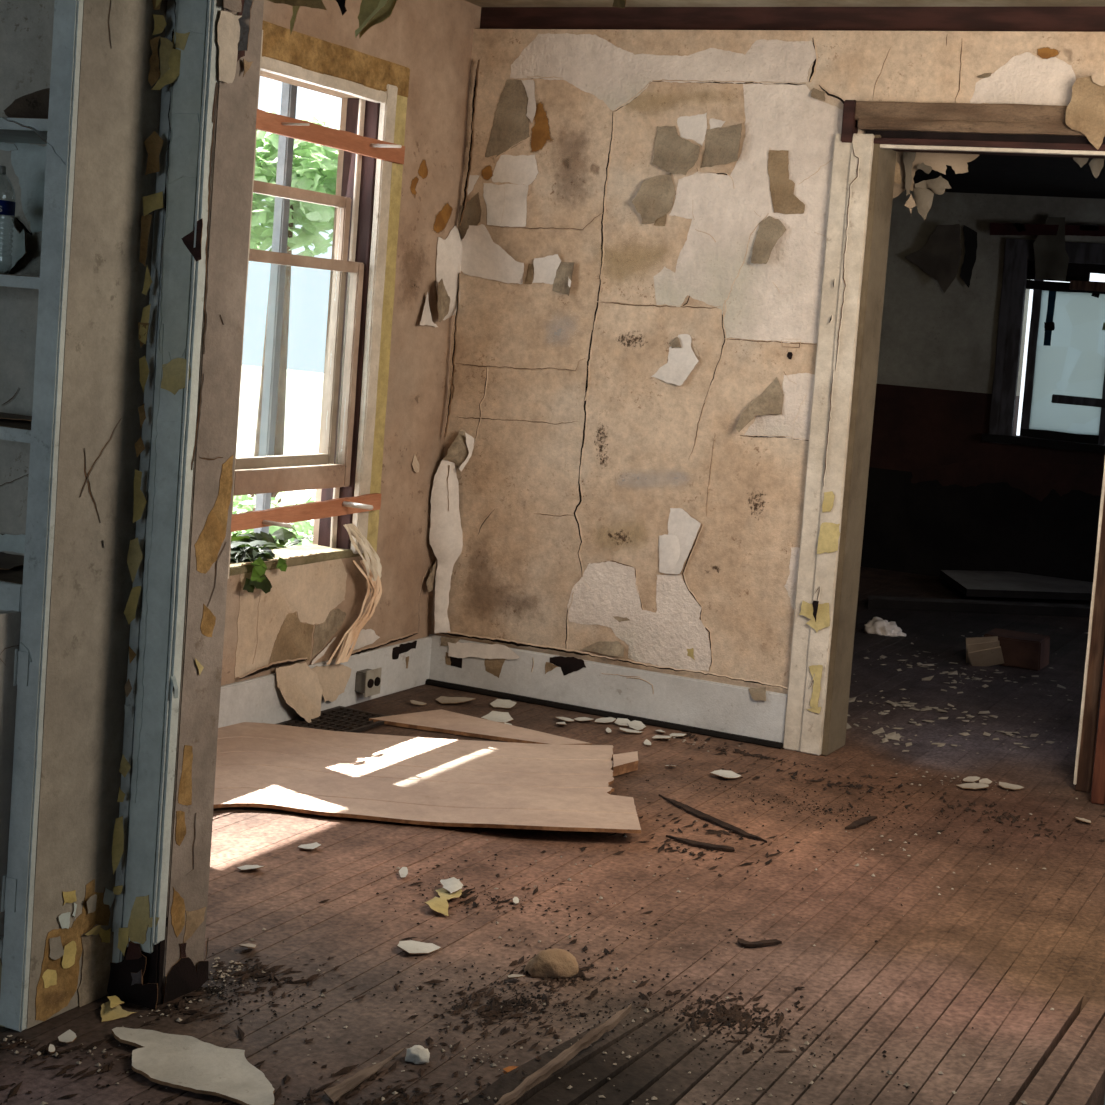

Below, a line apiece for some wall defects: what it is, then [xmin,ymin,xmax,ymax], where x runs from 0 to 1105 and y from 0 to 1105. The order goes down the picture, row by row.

peeling [212,0,254,122]
crack [873,48,891,100]
crack [946,34,963,103]
peeling [970,52,1076,106]
peeling [467,33,843,343]
crack [347,37,860,694]
peeling [736,371,815,440]
crack [240,589,308,679]
peeling [234,551,347,678]
spalling [440,636,520,678]
peeling [545,508,711,675]
spalling [35,816,206,1021]